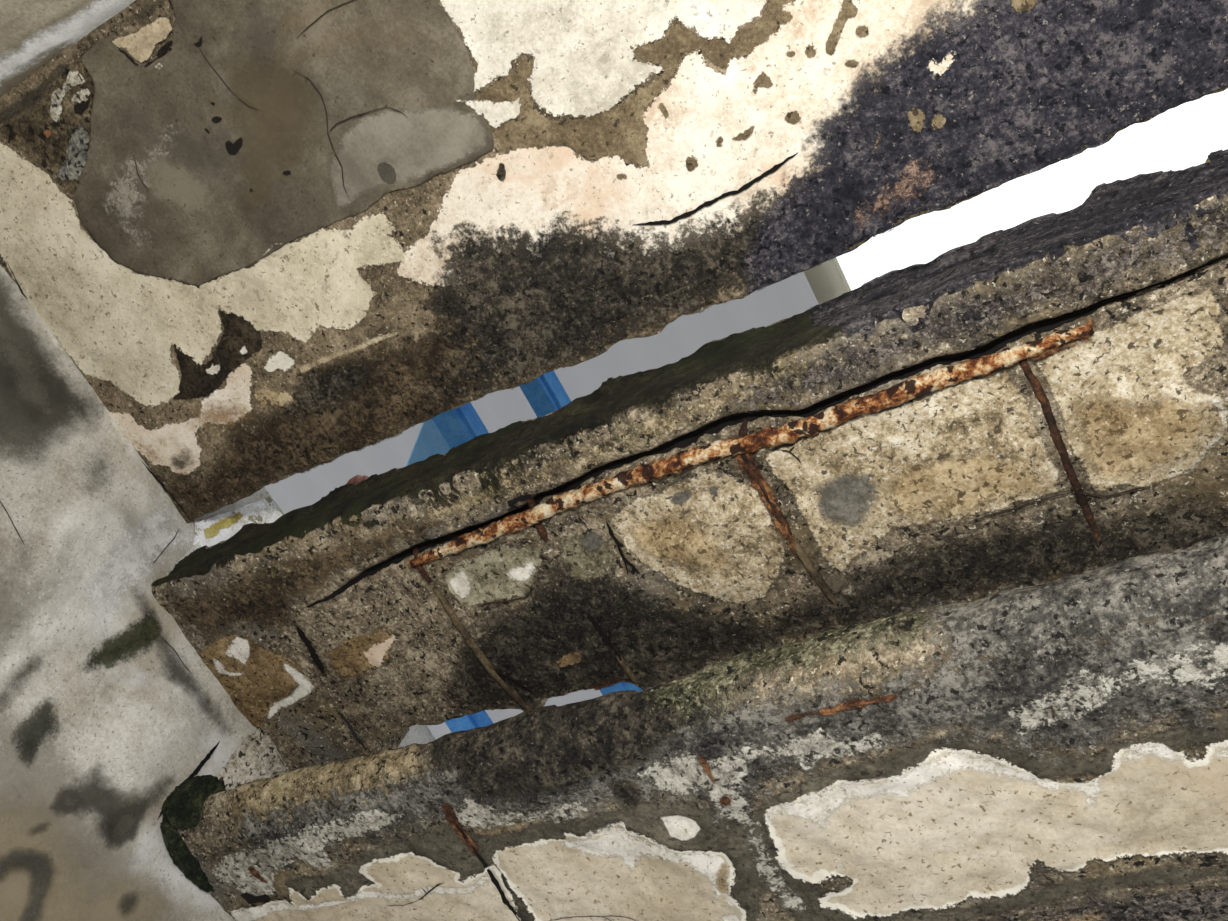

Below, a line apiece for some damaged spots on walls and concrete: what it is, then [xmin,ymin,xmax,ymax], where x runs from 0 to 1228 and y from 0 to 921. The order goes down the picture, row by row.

peeling [0,0,987,475]
crack [634,152,798,225]
water stain [87,0,1228,725]
corrosion [1030,319,1094,360]
crack [296,255,1228,674]
corrosion [736,453,796,553]
peeling [409,288,1228,606]
peeling [200,634,314,790]
peeling [556,652,582,667]
corrosion [442,803,480,855]
peeling [231,719,1228,921]